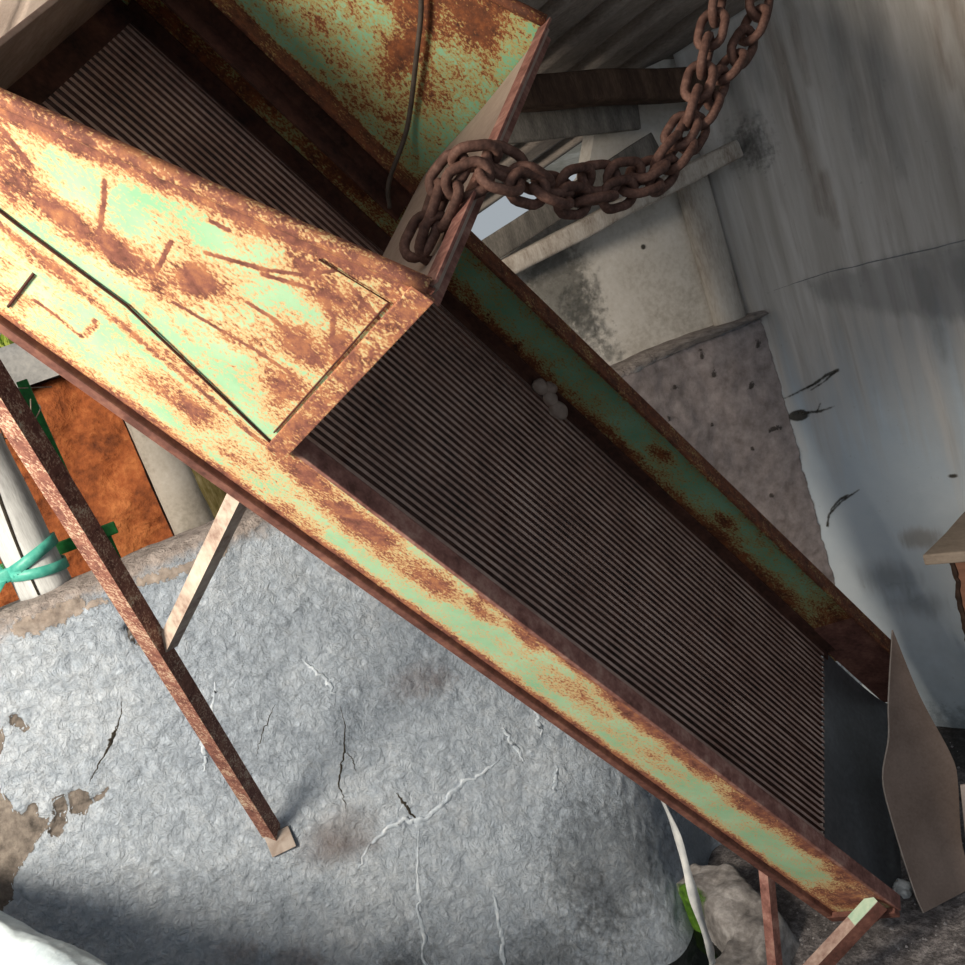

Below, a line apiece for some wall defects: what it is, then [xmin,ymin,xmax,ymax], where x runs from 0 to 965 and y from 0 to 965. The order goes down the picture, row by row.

crack [776,240,965,290]
flaking render [0,714,30,754]
crack [89,702,122,784]
crack [338,707,356,809]
flaking render [0,787,109,911]